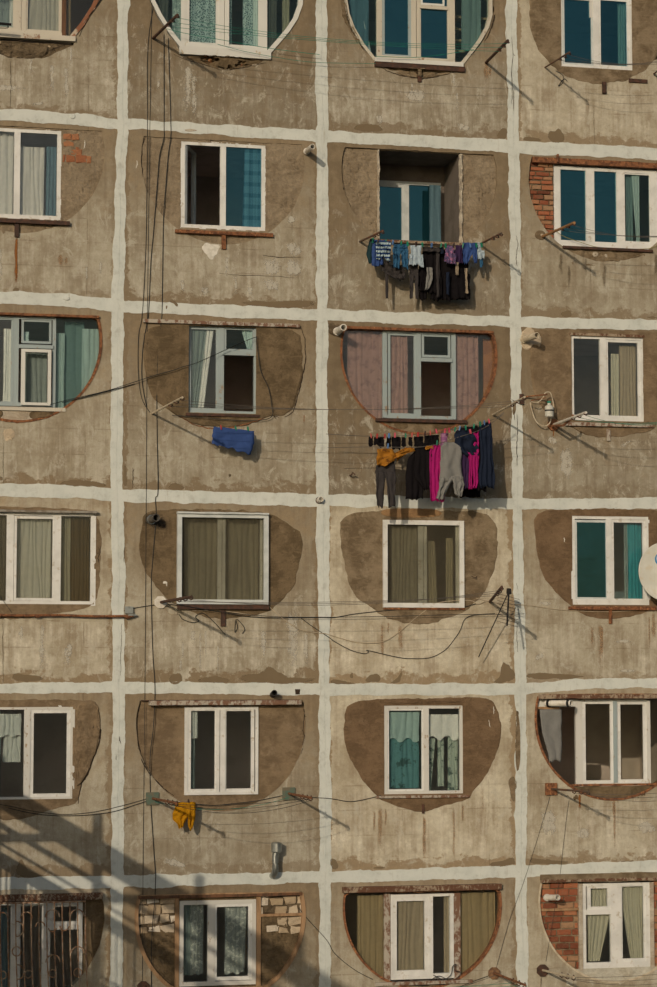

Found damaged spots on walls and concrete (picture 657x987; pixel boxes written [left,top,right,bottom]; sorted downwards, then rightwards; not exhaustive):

flaking render [63,134,91,163]